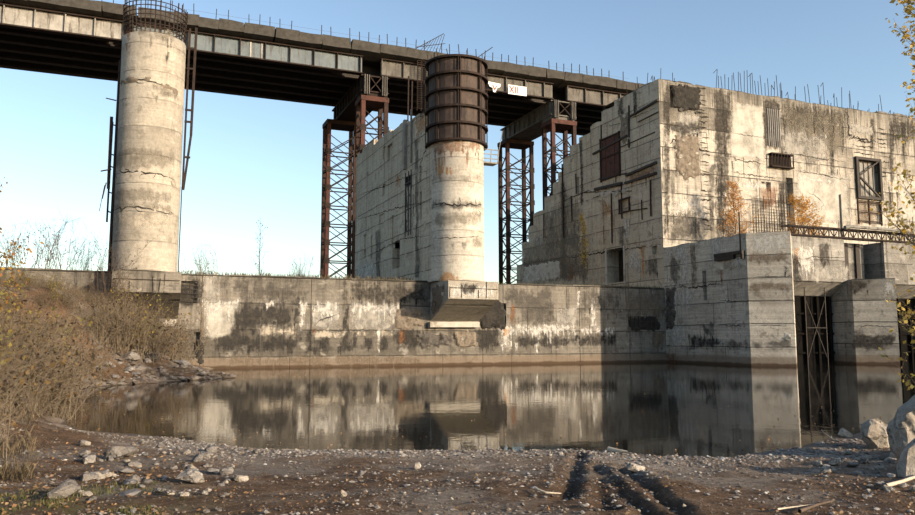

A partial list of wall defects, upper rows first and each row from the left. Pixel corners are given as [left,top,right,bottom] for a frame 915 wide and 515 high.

crack [114,201,172,214]
crack [118,169,173,186]
leakage [406,141,419,277]
crack [358,148,482,221]
rust [435,140,479,175]
leakage [619,86,875,313]
leakage [888,116,915,226]
crack [361,236,478,259]
leakage [180,234,433,355]